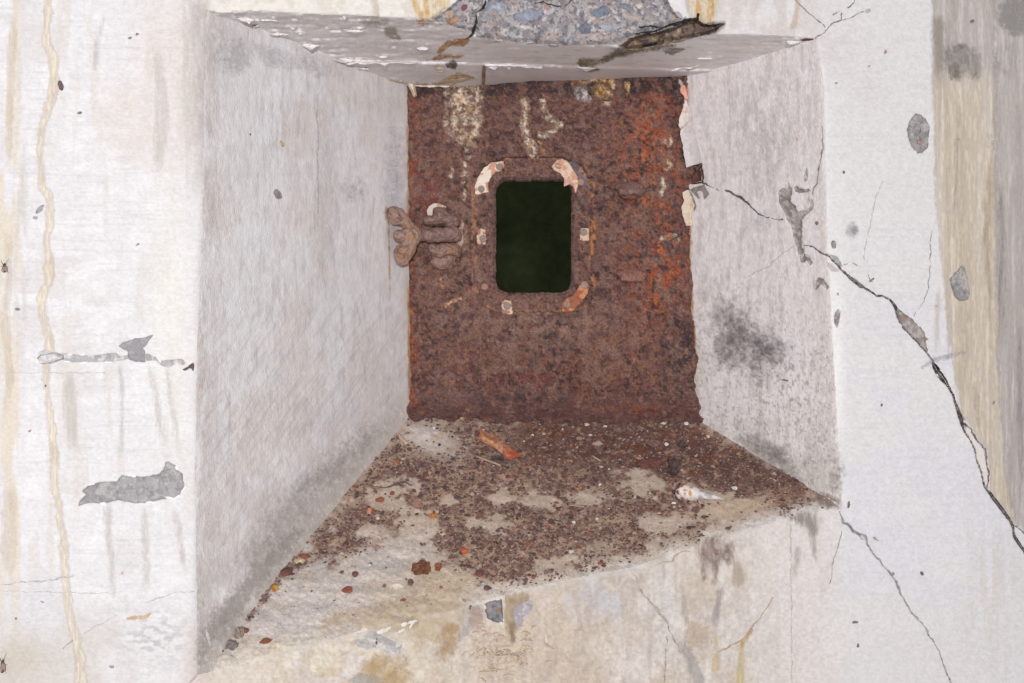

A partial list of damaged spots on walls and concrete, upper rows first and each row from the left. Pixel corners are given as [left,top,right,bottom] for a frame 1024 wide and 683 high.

spalling [428,0,725,52]
leakage [36,0,60,352]
crack [702,182,783,220]
spalling [778,167,819,265]
spalling [907,113,930,154]
spalling [950,265,970,303]
leakage [932,0,1024,528]
spalling [60,335,194,371]
crack [748,181,1024,552]
leakage [42,364,87,683]
spalling [78,462,187,506]
crack [829,511,952,683]